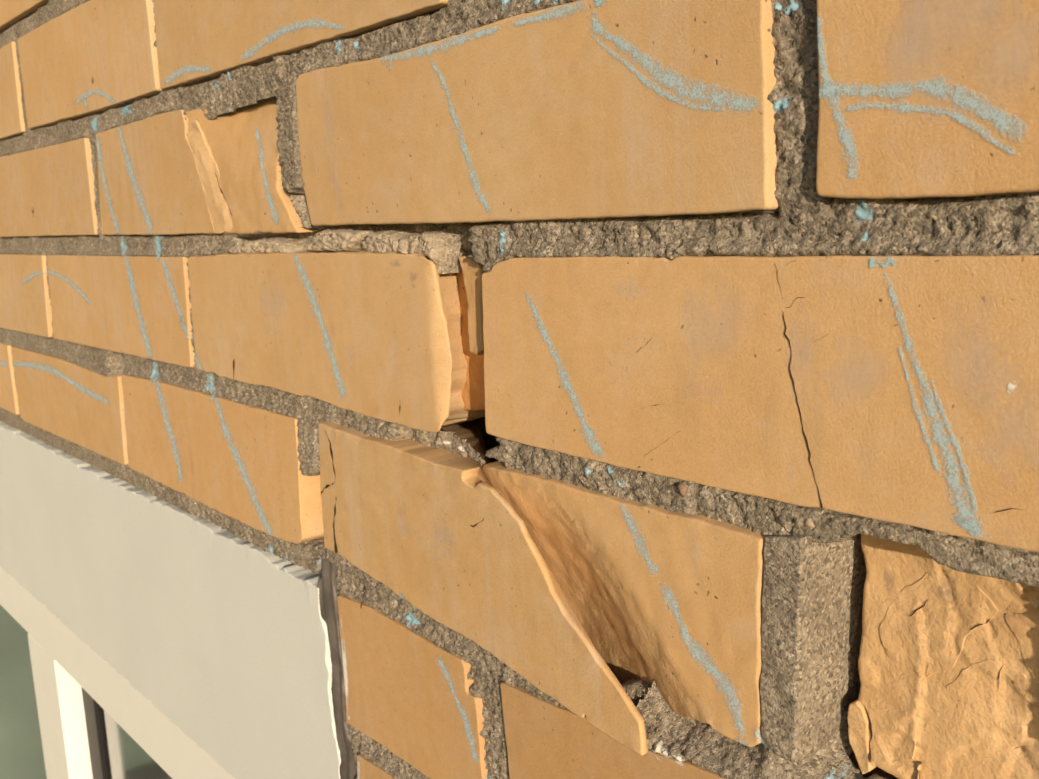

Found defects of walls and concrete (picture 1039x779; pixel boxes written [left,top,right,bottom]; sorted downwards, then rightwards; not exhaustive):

spalling [185,96,320,235]
crack [321,431,338,553]
crack [776,272,823,508]
spalling [847,534,1039,779]